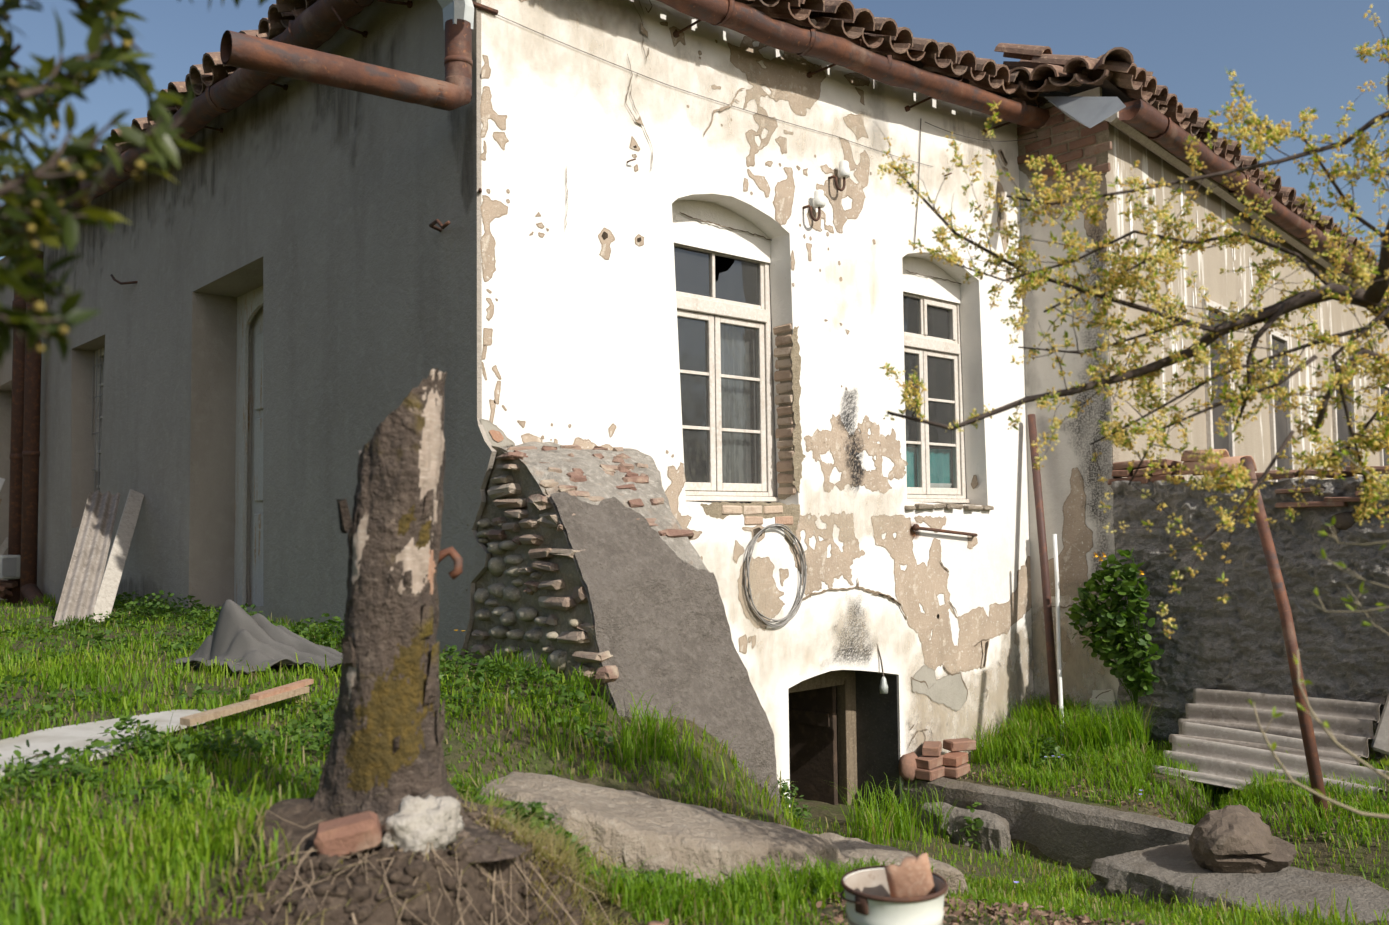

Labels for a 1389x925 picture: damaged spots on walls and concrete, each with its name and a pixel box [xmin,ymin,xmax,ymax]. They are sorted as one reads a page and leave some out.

spalling [660,21,702,59]
peeling [480,55,509,161]
peeling [715,36,872,287]
peeling [480,189,616,450]
peeling [665,323,1032,675]
damp [847,437,864,487]
peeling [1048,467,1093,596]